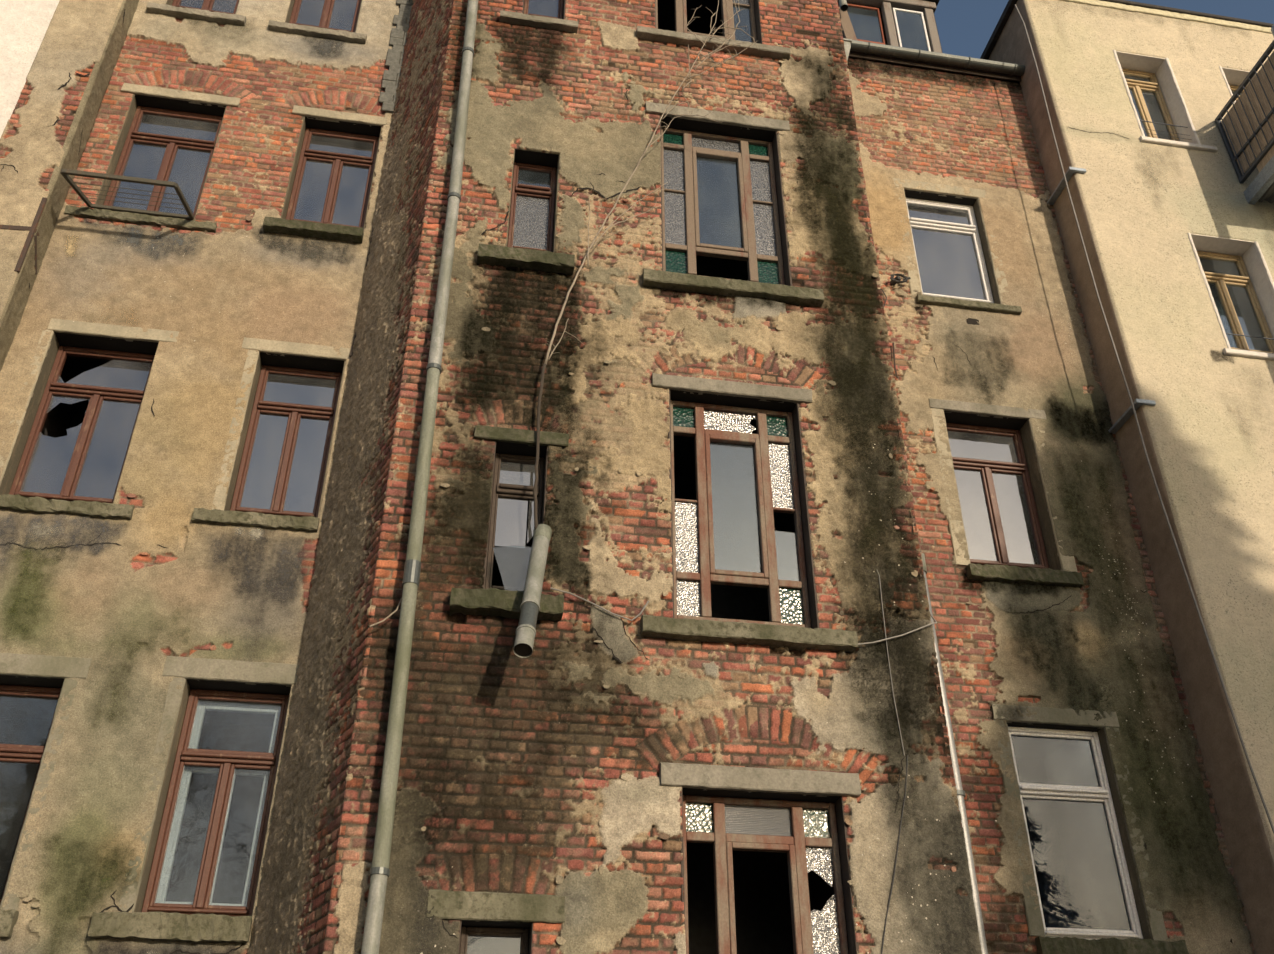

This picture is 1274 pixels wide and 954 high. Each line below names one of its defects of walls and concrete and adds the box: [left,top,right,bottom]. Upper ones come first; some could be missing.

flaking render [0,78,35,158]
flaking render [55,61,99,146]
flaking render [39,164,58,191]
water stain [0,514,119,560]
crack [0,532,121,550]
flaking render [65,0,686,954]
water stain [432,444,493,589]
water stain [456,265,610,606]
water stain [793,56,1021,765]
flaking render [662,0,1255,954]
water stain [1048,400,1111,443]
flaking render [560,605,720,707]